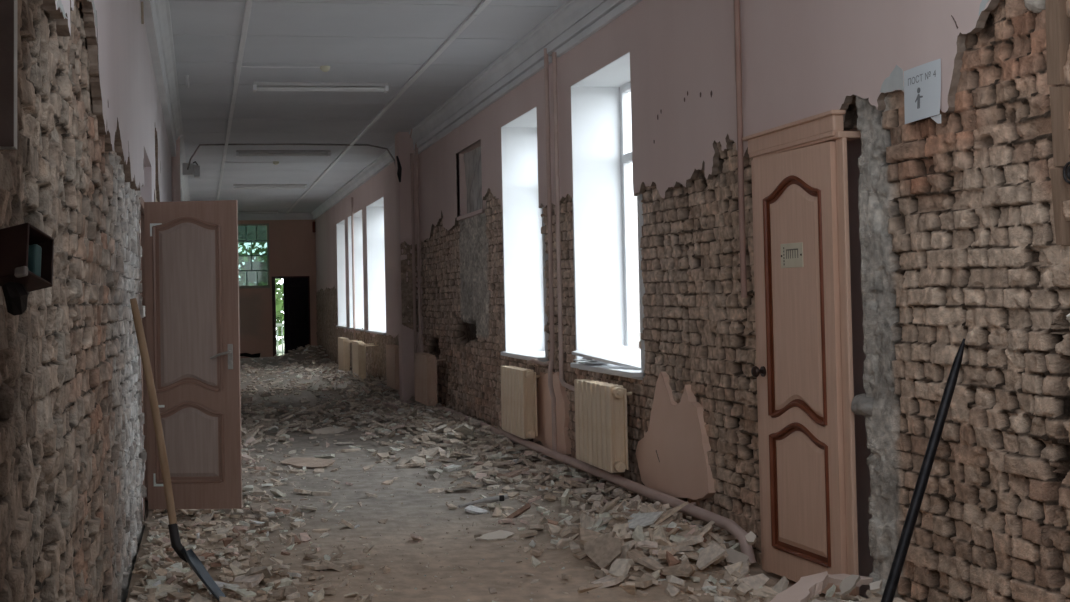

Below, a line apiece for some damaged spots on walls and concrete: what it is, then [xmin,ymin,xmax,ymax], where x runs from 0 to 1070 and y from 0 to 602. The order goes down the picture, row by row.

spalling [0,0,147,602]
spalling [316,140,762,566]
spalling [843,0,1070,602]